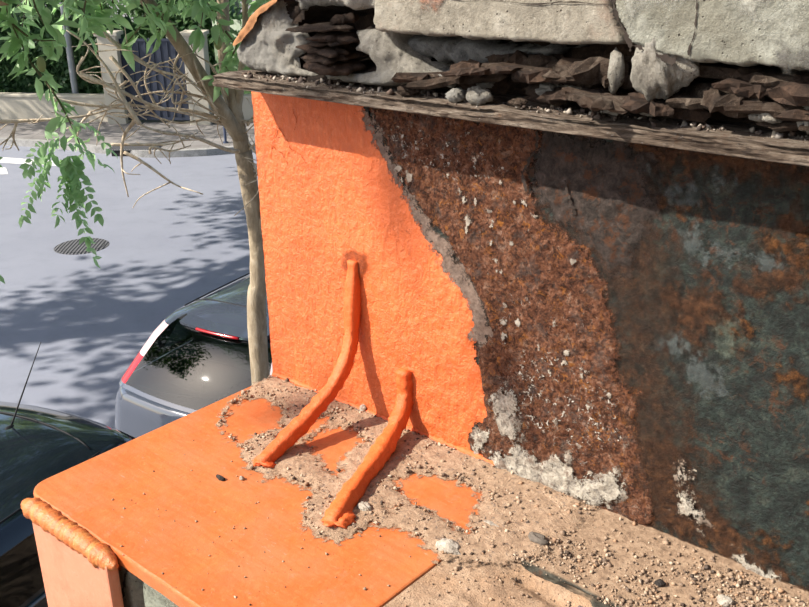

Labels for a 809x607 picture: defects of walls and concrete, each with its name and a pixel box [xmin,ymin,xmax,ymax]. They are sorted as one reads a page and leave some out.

spalling [284,0,377,84]
crack [486,0,698,66]
peeling [381,126,428,183]
rust [369,107,809,592]
water stain [471,380,629,509]